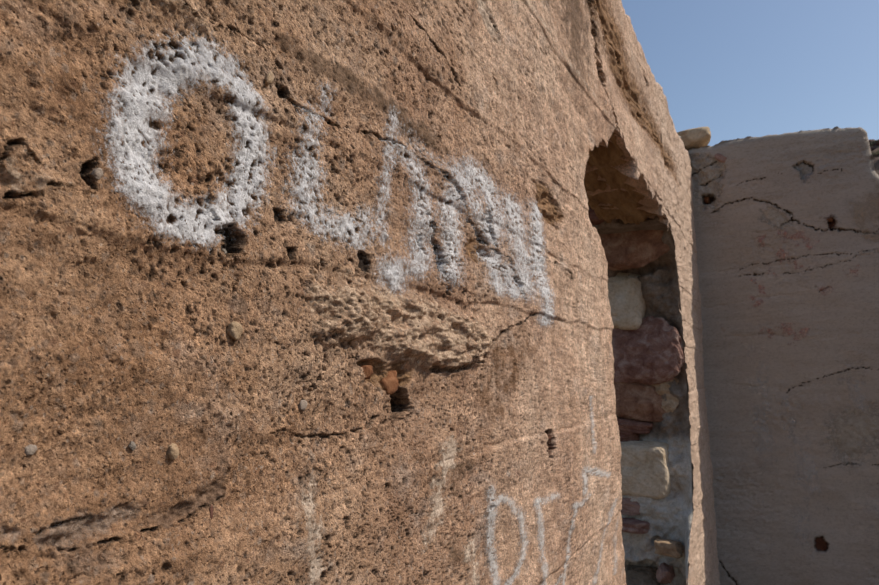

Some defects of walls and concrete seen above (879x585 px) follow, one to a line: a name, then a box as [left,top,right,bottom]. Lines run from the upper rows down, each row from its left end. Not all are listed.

crack [412,18,459,84]
crack [714,173,879,291]
crack [429,361,482,373]
crack [788,367,879,391]
crack [36,517,90,535]